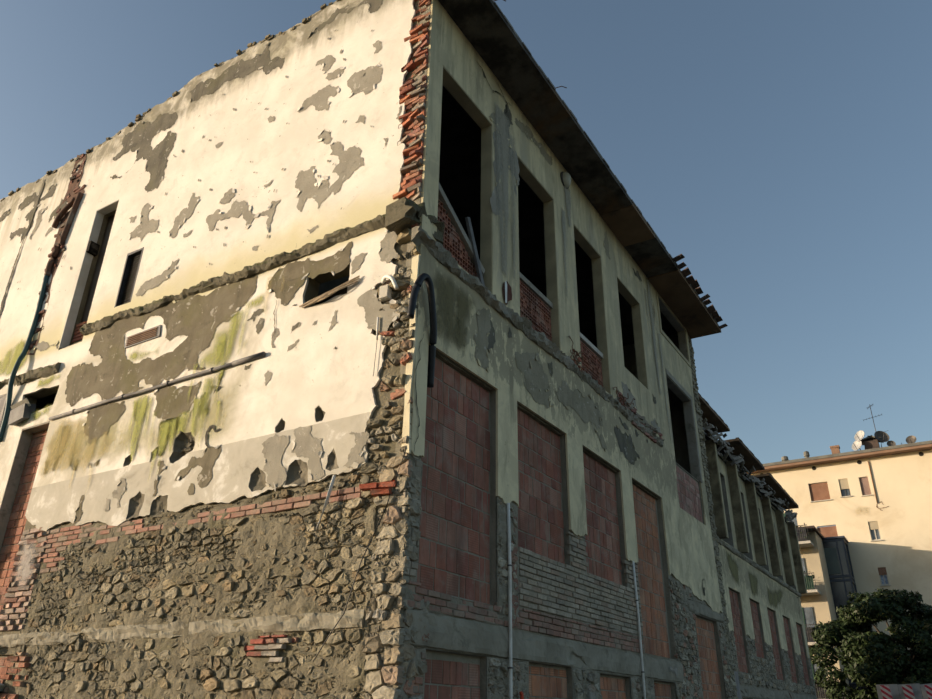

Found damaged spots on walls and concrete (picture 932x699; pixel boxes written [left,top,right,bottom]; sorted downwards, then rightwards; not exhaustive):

peeling [190,42,287,102]
crack [0,180,44,315]
peeling [110,112,184,195]
peeling [129,180,281,240]
peeling [295,129,364,212]
leakage [0,341,26,375]
leakage [50,396,152,467]
peeling [105,432,221,521]
leakage [153,313,243,460]
peeling [65,241,367,444]
peeling [249,406,369,492]
crack [414,335,424,450]